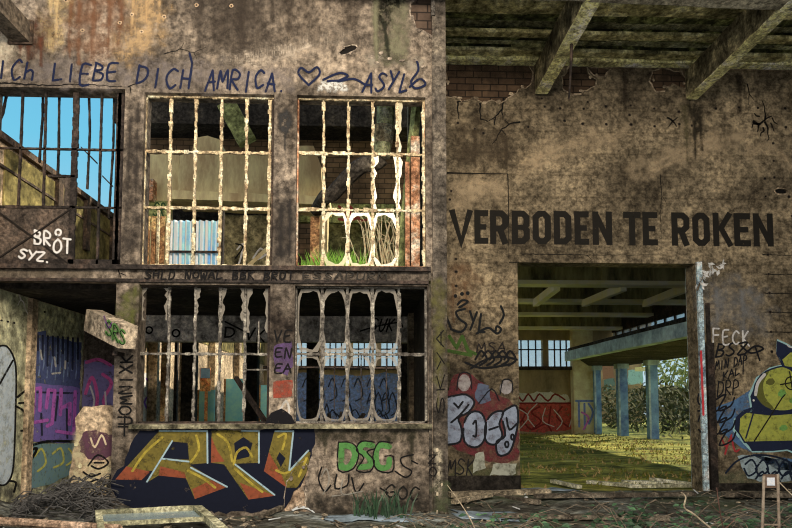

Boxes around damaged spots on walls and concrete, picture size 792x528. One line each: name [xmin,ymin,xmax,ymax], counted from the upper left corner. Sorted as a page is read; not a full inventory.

peeling [367,0,432,69]
spalling [446,64,534,104]
spalling [561,66,611,96]
crack [747,84,778,140]